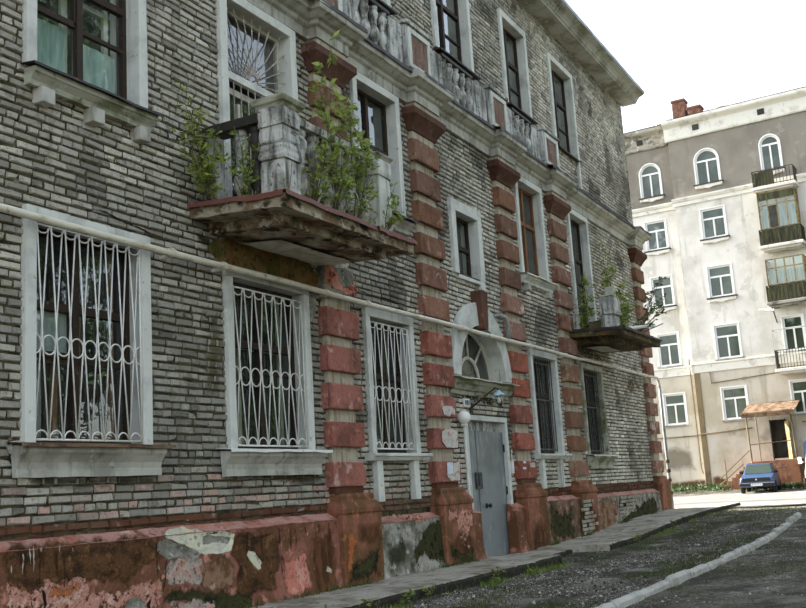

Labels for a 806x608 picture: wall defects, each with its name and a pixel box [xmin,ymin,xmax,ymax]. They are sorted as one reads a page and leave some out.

flaking render [317,263,357,298]
water stain [664,450,691,468]
peeling [449,507,473,548]
peeling [6,526,235,608]
flaking render [247,550,262,570]
crack [31,590,47,608]